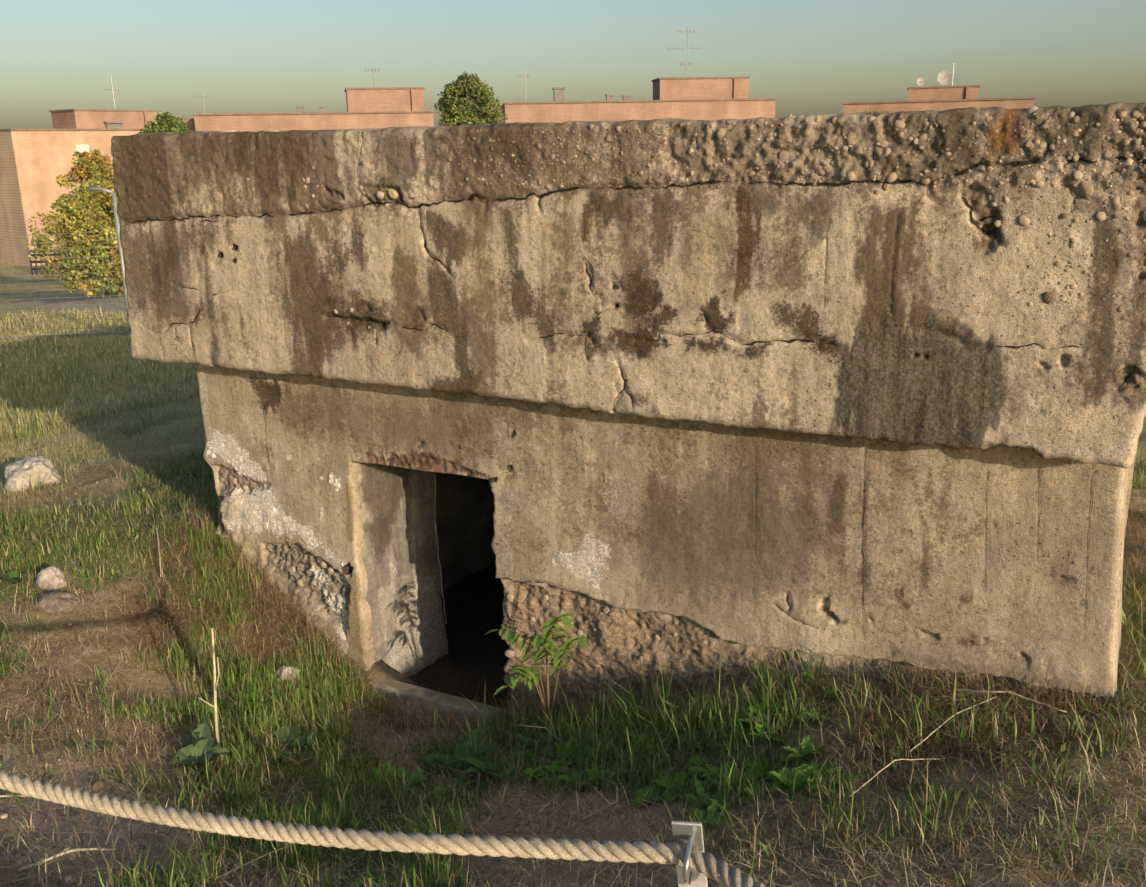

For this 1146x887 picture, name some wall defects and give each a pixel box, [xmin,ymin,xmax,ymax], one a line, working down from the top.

damp [250,225,365,415]
damp [424,211,484,397]
crack [585,262,596,297]
crack [123,131,1146,277]
crack [530,313,835,414]
spalling [442,106,1146,315]
damp [829,193,1010,450]
corrosion [987,108,1021,164]
crack [933,330,1077,351]
damp [1072,195,1129,410]
peeling [205,429,353,655]
spalling [495,576,790,710]